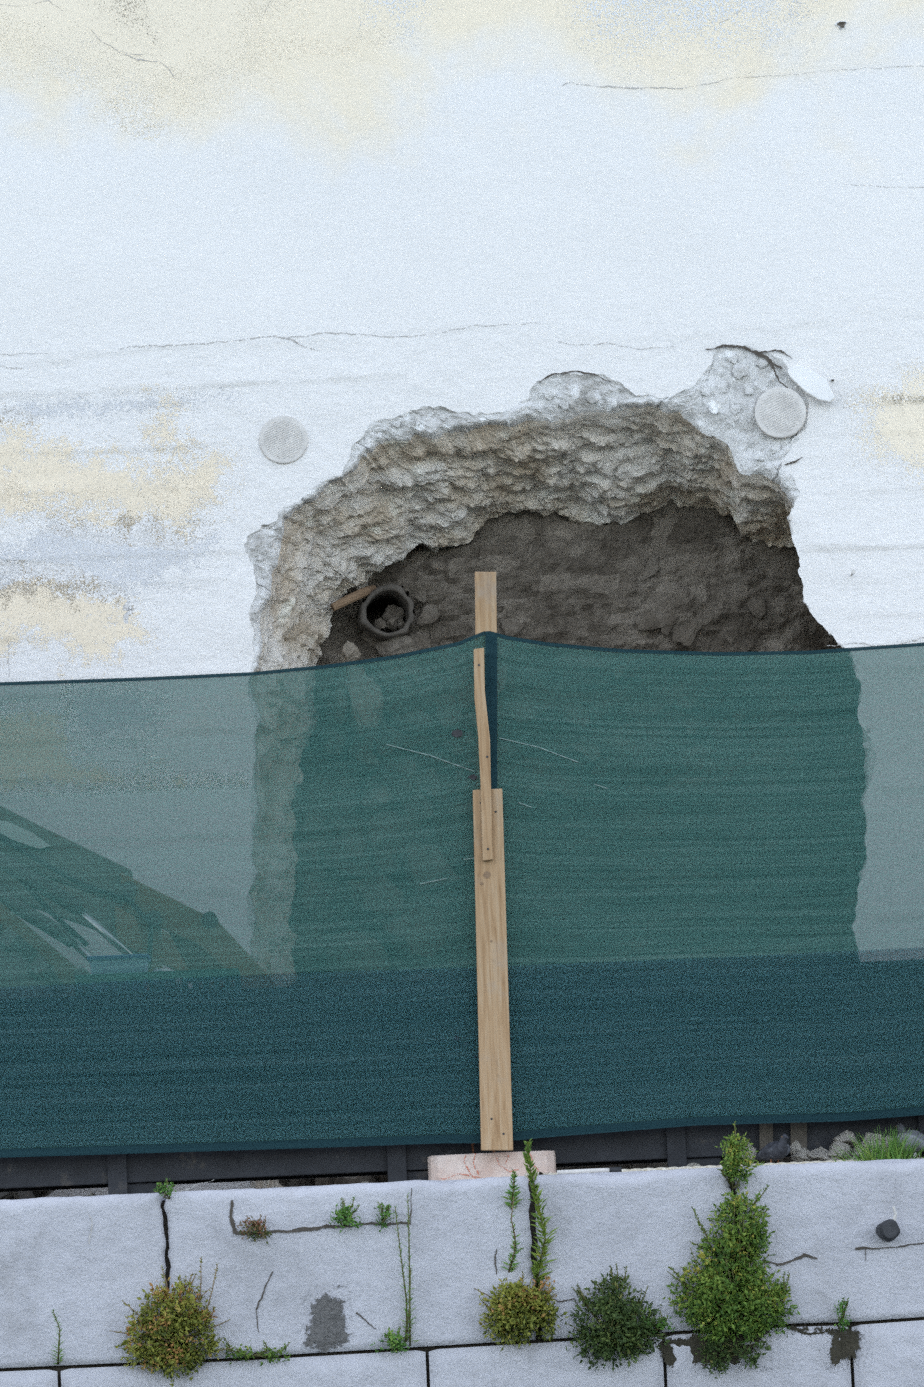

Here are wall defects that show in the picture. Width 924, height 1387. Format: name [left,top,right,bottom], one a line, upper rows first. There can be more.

peeling [0,383,245,680]
spalling [244,345,924,672]
spalling [249,1178,315,1189]
crack [171,1180,412,1235]
spalling [556,1162,668,1173]
crack [256,1271,273,1332]